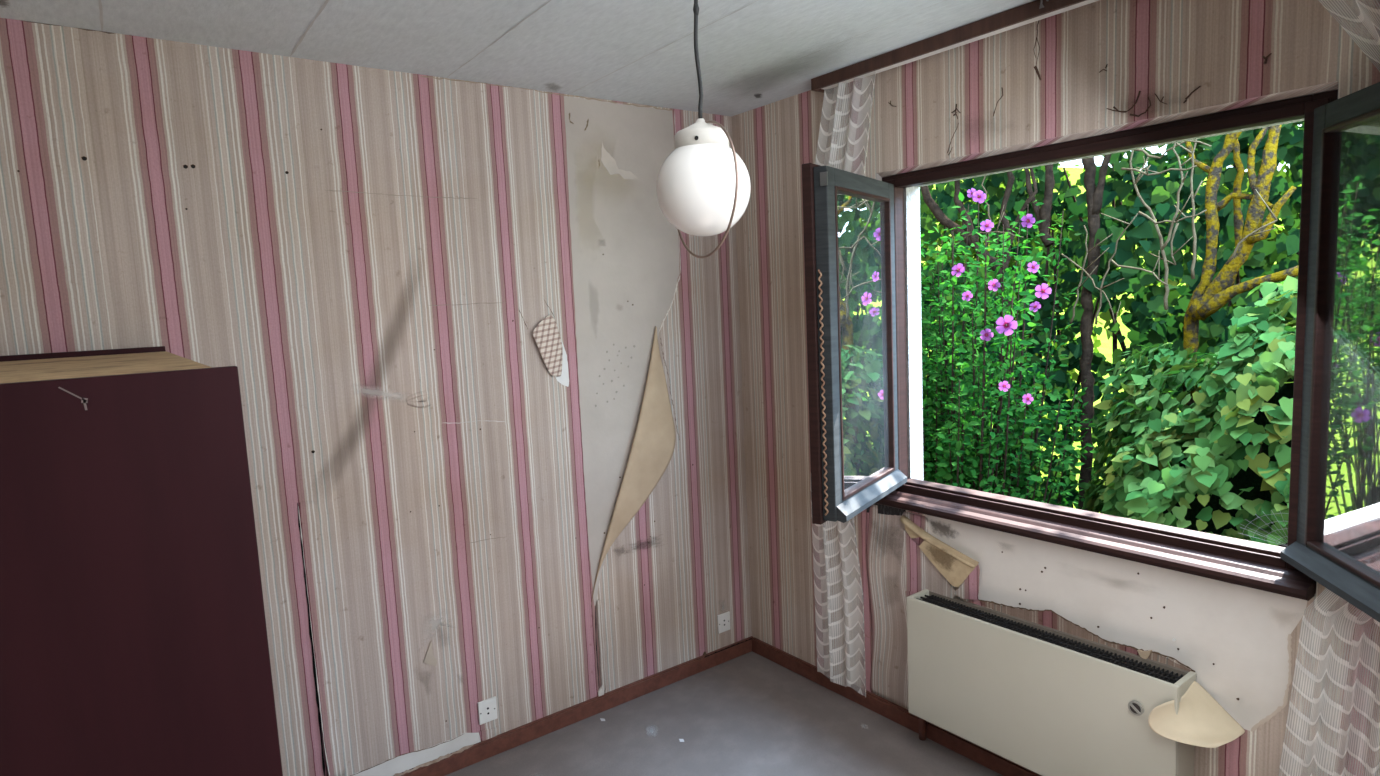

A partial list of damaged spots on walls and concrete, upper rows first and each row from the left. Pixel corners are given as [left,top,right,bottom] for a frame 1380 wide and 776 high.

flaking render [564,96,680,606]
flaking render [908,512,1307,731]